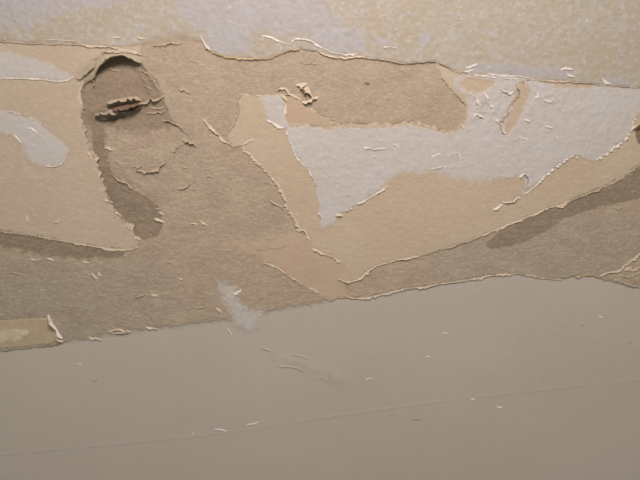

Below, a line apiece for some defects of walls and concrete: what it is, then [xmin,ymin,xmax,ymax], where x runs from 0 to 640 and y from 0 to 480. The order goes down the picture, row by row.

spalling [76,50,192,242]
leakage [484,167,640,250]